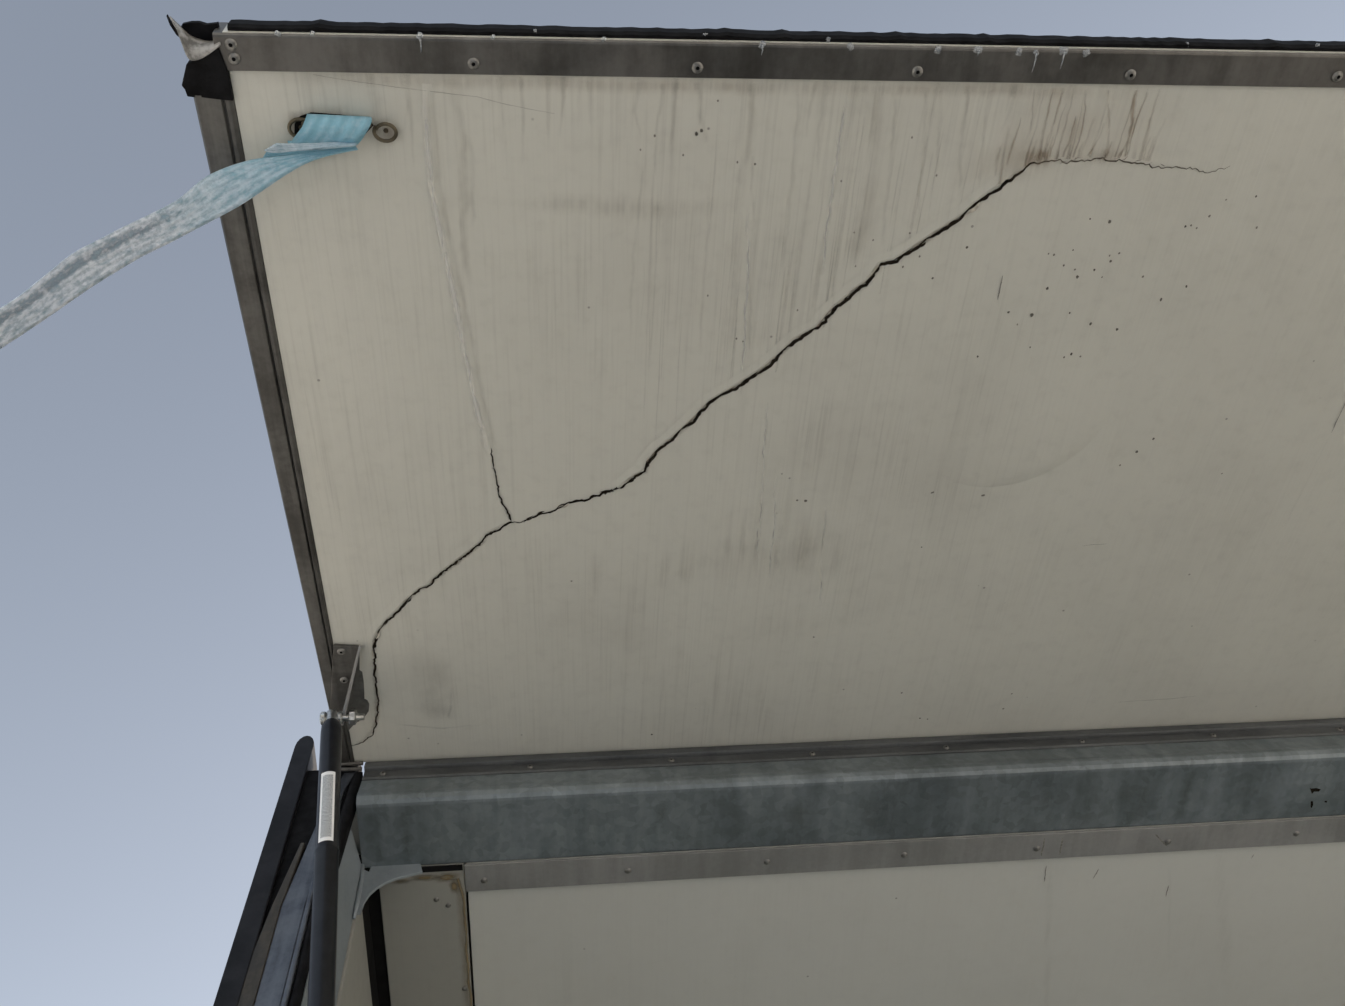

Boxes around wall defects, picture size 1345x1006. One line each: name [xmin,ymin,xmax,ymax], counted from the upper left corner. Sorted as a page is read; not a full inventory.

crack [351,154,1226,746]